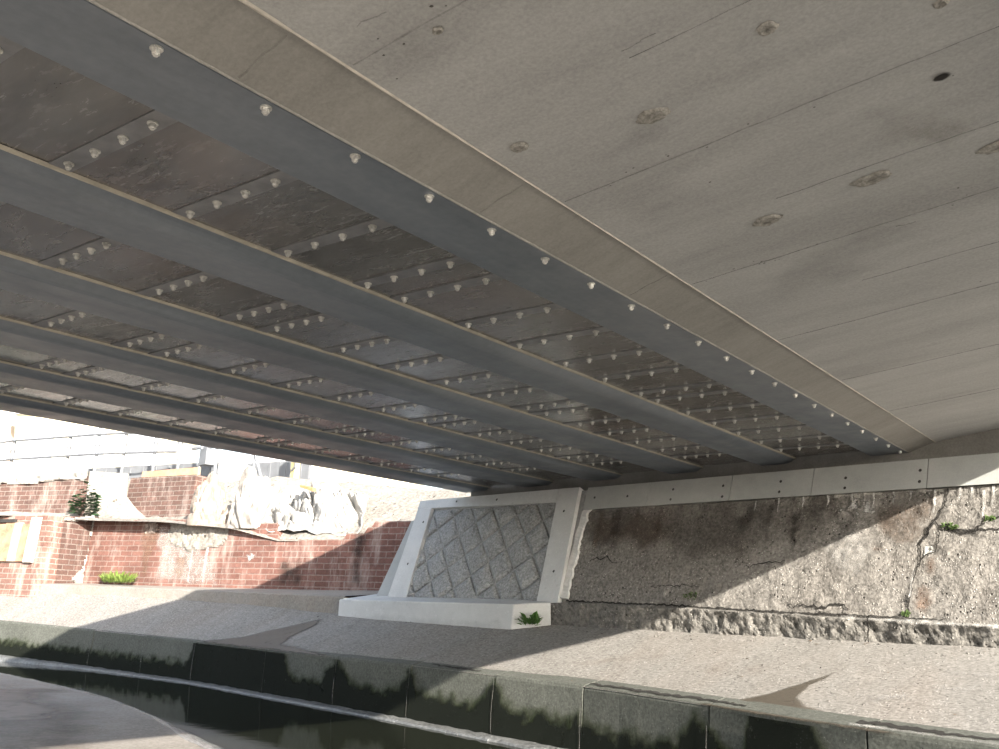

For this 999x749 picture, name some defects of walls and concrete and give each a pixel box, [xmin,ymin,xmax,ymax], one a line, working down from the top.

spalling [849,170,892,187]
crack [566,488,999,642]